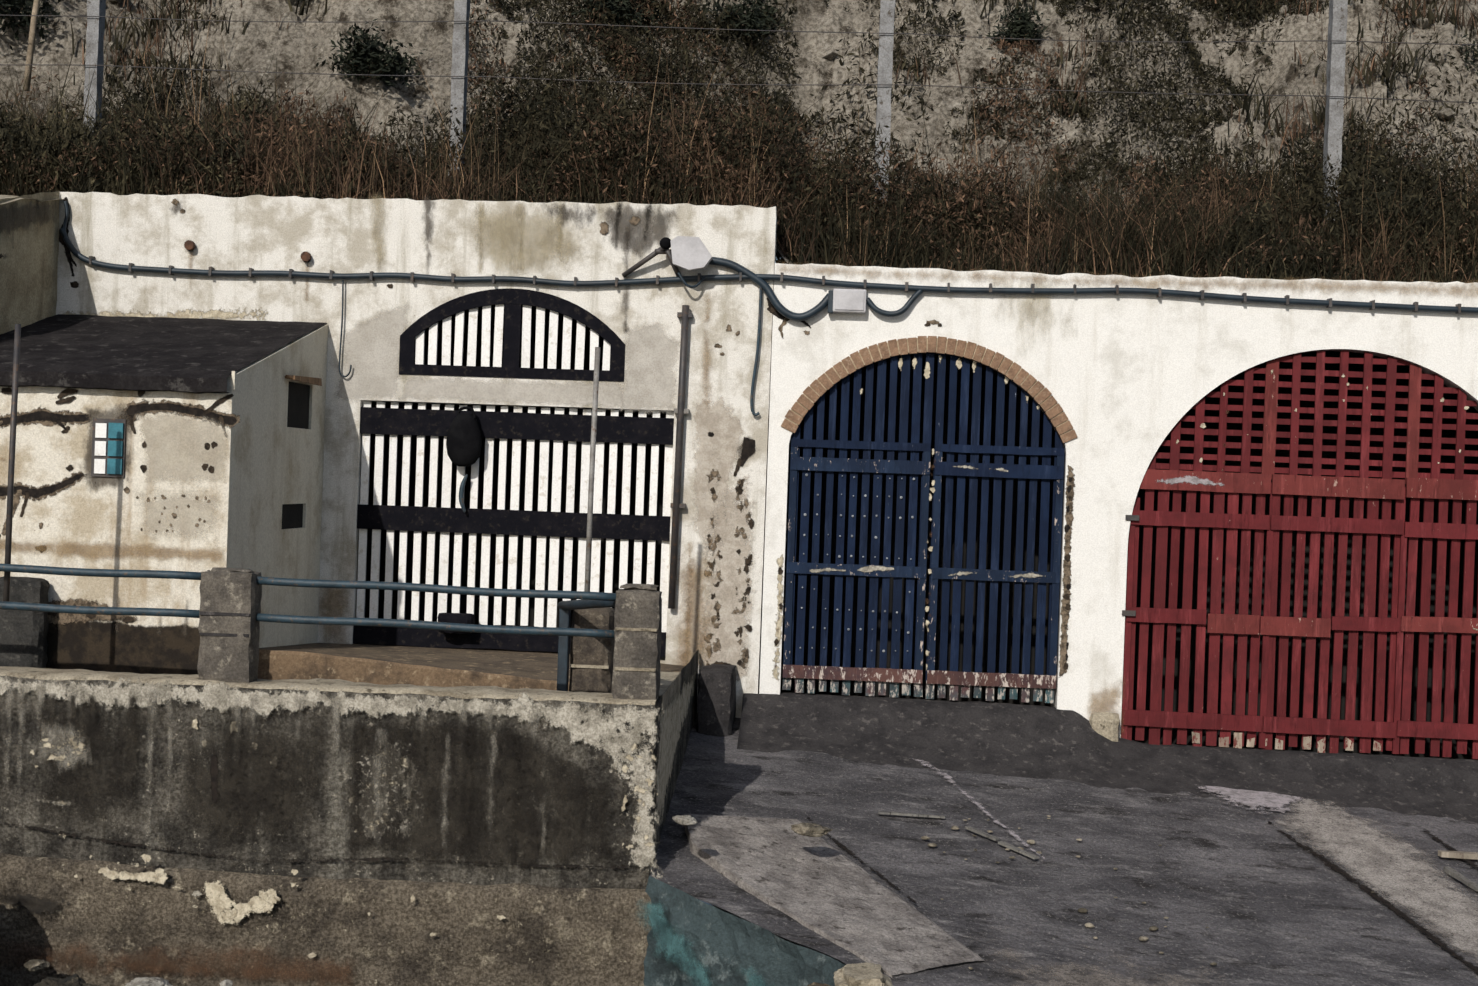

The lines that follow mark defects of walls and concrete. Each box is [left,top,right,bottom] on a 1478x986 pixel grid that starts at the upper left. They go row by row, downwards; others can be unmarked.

flaking render [55,388,78,404]
flaking render [124,415,226,535]
flaking render [650,397,755,868]
damp [0,606,663,879]
spalling [90,854,299,930]